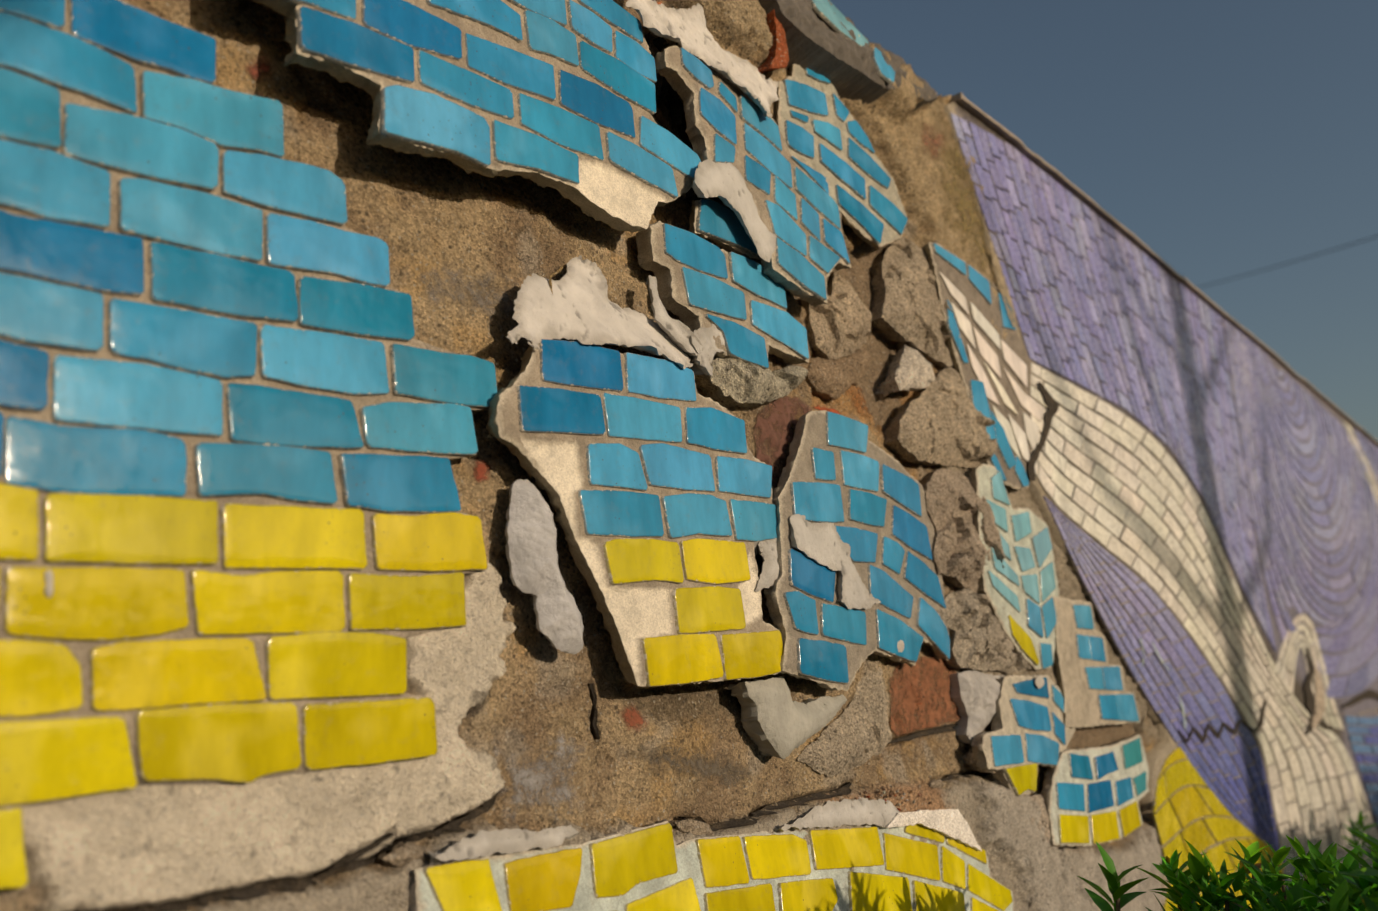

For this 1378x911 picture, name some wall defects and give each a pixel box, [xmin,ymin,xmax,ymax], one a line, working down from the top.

spalling [652,0,789,82]
spalling [124,0,731,393]
spalling [839,35,1017,339]
spalling [725,289,972,495]
spalling [0,409,1166,911]
crack [91,792,500,911]
crack [678,782,852,831]
crack [937,771,991,781]